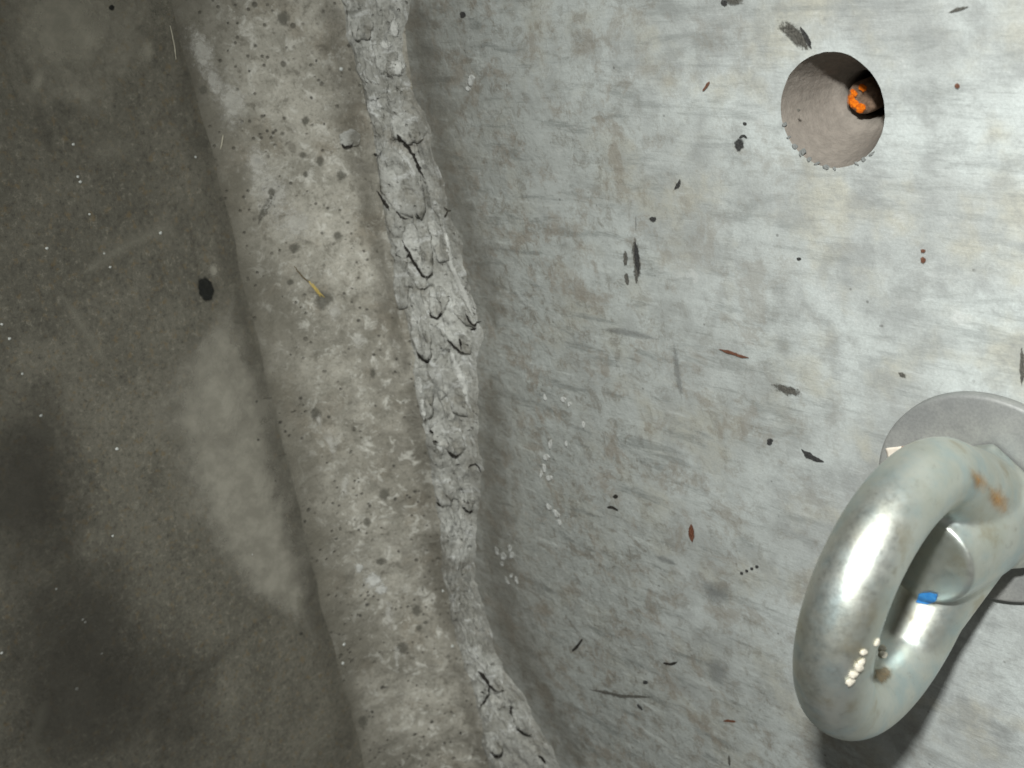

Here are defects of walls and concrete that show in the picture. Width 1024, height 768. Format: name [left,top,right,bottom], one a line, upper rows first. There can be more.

corrosion [847,84,867,113]
crack [342,134,425,179]
crack [377,192,432,278]
crack [429,311,481,354]
damp [173,323,306,619]
crack [429,430,481,472]
crack [478,671,546,764]